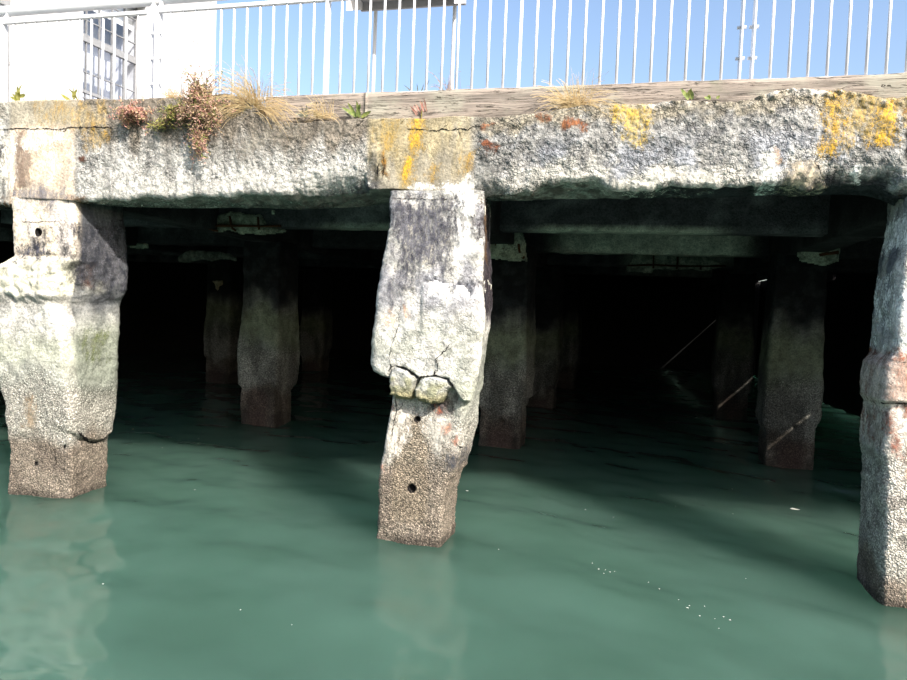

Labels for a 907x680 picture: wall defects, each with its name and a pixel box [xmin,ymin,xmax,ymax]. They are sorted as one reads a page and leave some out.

water stain [386,154,503,318]
spalling [490,233,527,262]
water stain [870,214,907,349]
crack [388,309,454,388]
corrosion [859,346,907,460]